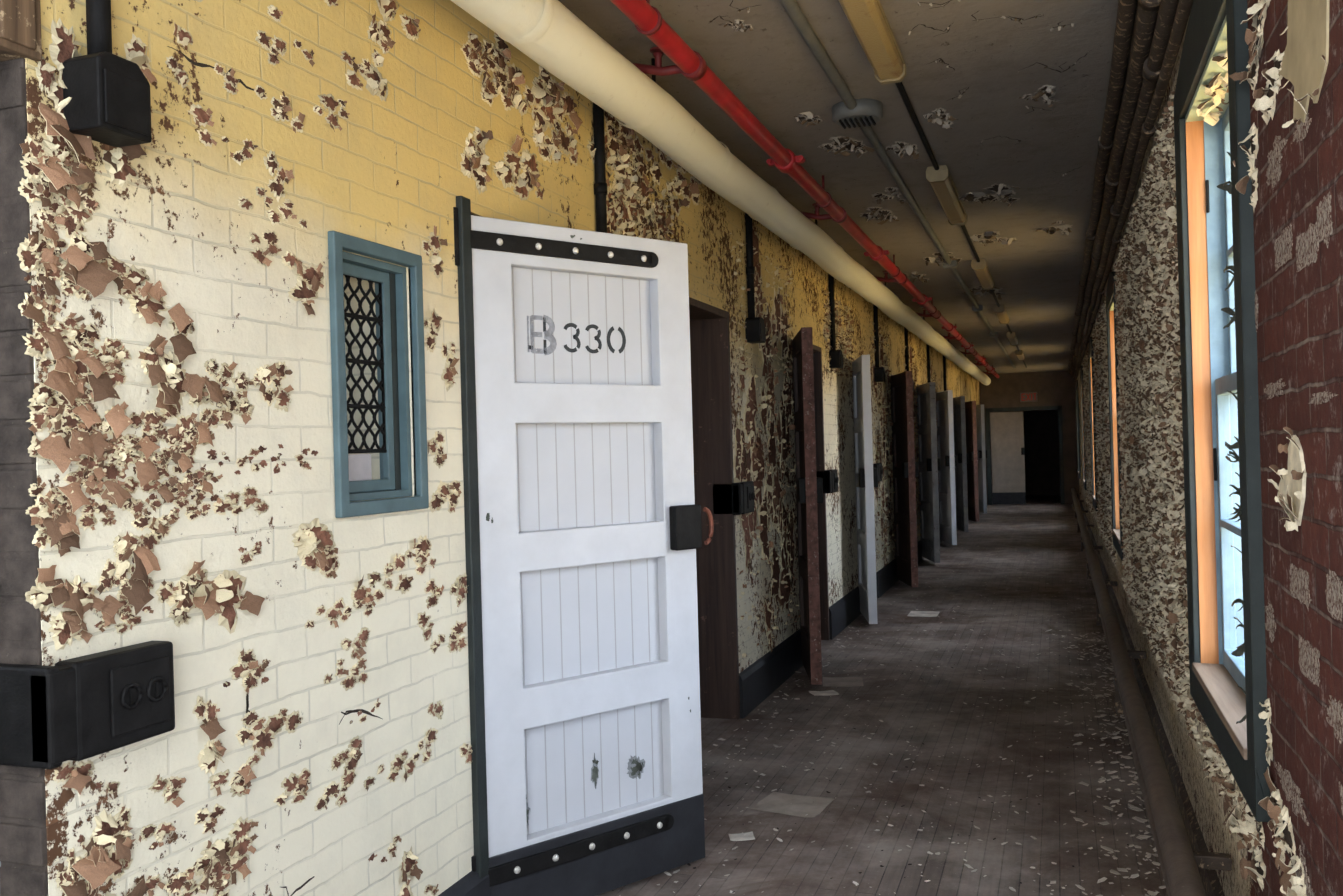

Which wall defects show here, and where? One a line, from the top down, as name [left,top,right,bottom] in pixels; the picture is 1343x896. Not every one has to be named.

peeling [460,31,702,242]
peeling [1196,0,1329,211]
peeling [421,225,448,279]
peeling [17,18,324,650]
peeling [424,307,459,392]
peeling [223,648,271,693]
peeling [292,518,340,579]
peeling [304,535,469,691]
peeling [427,431,462,514]
peeling [1082,85,1307,896]
peeling [53,695,303,896]
peeling [627,756,645,779]